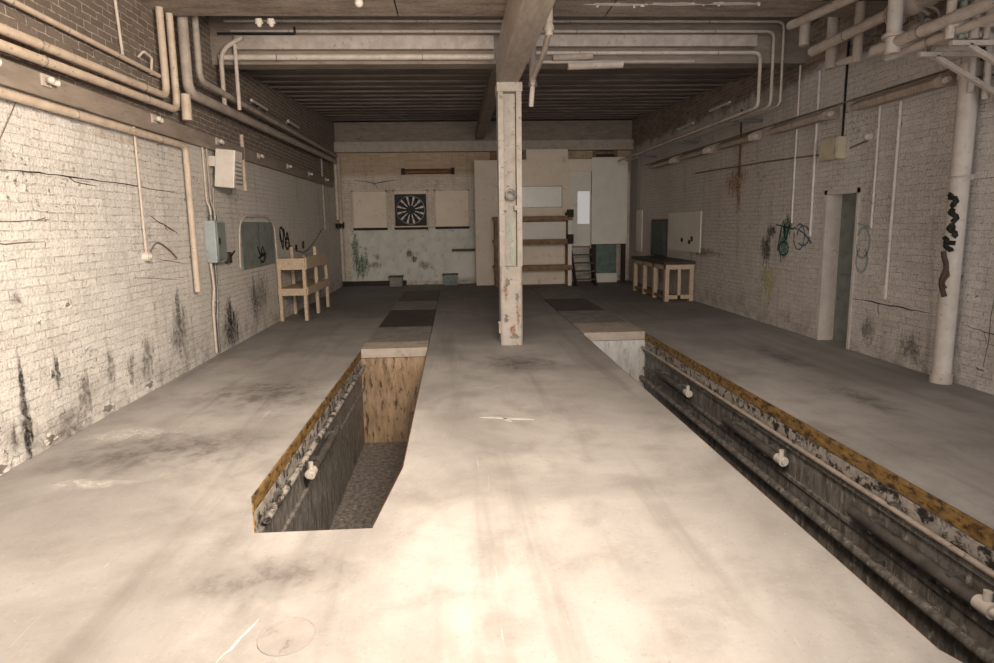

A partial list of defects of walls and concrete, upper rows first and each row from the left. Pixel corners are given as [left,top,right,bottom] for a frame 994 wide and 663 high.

crack [0,169,182,195]
crack [0,217,49,247]
water stain [13,360,33,455]